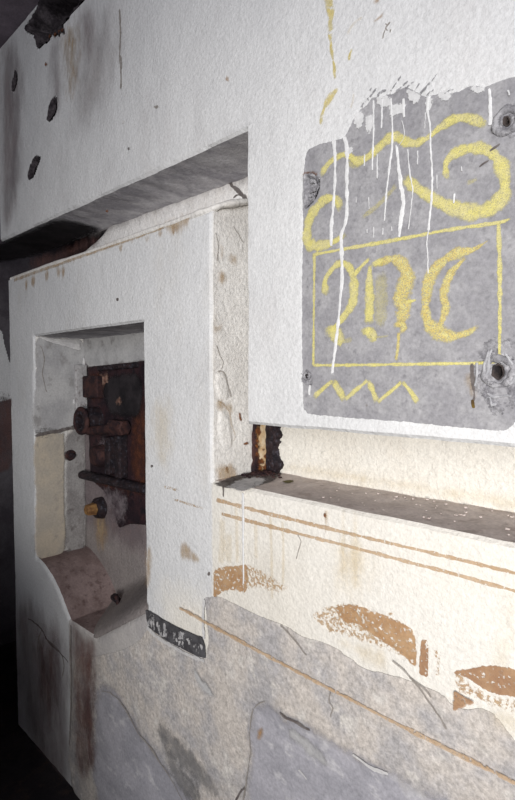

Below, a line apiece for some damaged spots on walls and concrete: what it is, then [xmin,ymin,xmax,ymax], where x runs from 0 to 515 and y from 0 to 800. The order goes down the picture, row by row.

spalling [24,0,85,48]
peeling [302,75,515,431]
rust [131,415,145,483]
flaking render [69,597,515,800]